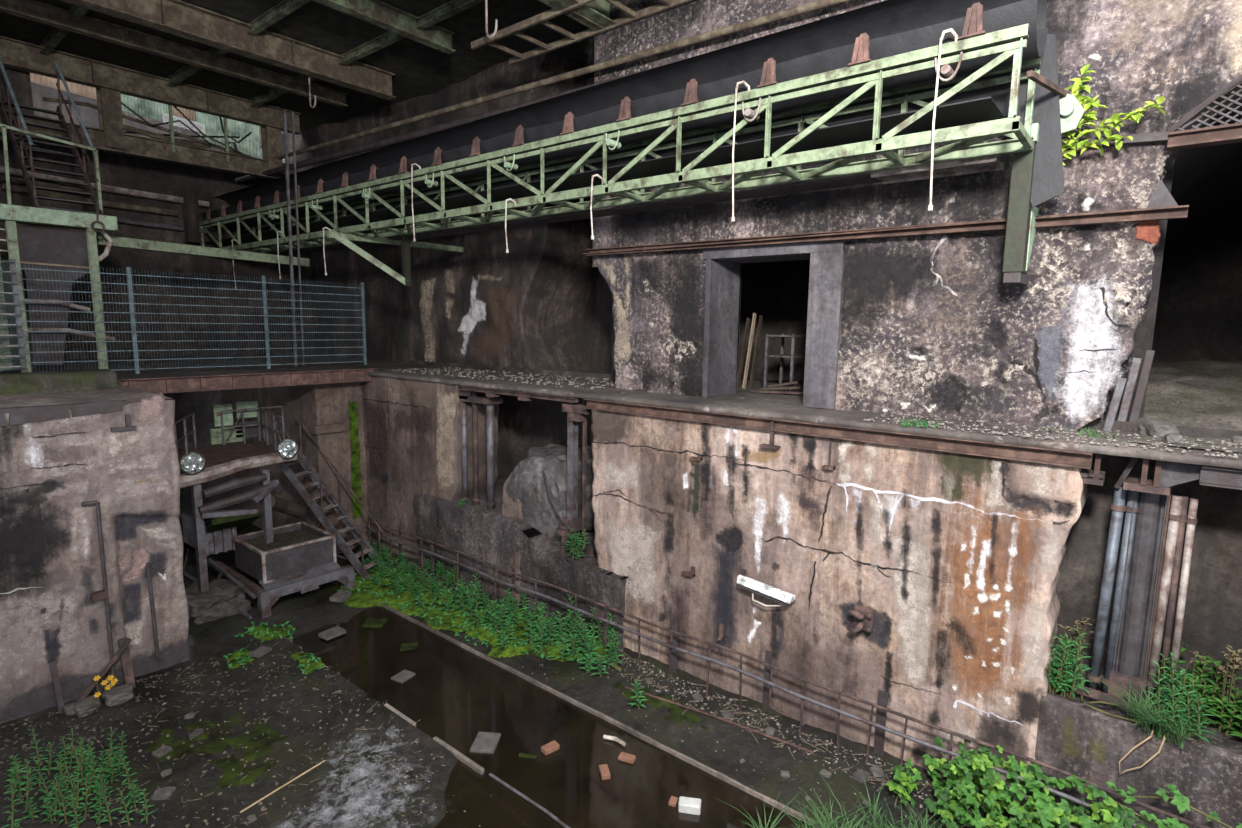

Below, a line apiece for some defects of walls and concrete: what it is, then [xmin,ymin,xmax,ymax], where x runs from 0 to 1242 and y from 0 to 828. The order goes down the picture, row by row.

water stain [458,280,486,354]
spalling [649,316,696,360]
water stain [592,411,628,442]
water stain [8,481,63,505]
water stain [0,512,193,724]
crack [593,489,668,523]
water stain [607,423,765,661]
water stain [714,548,783,658]
water stain [779,433,821,535]
water stain [838,441,972,698]
corrosion [941,517,1029,700]
water stain [912,744,927,763]